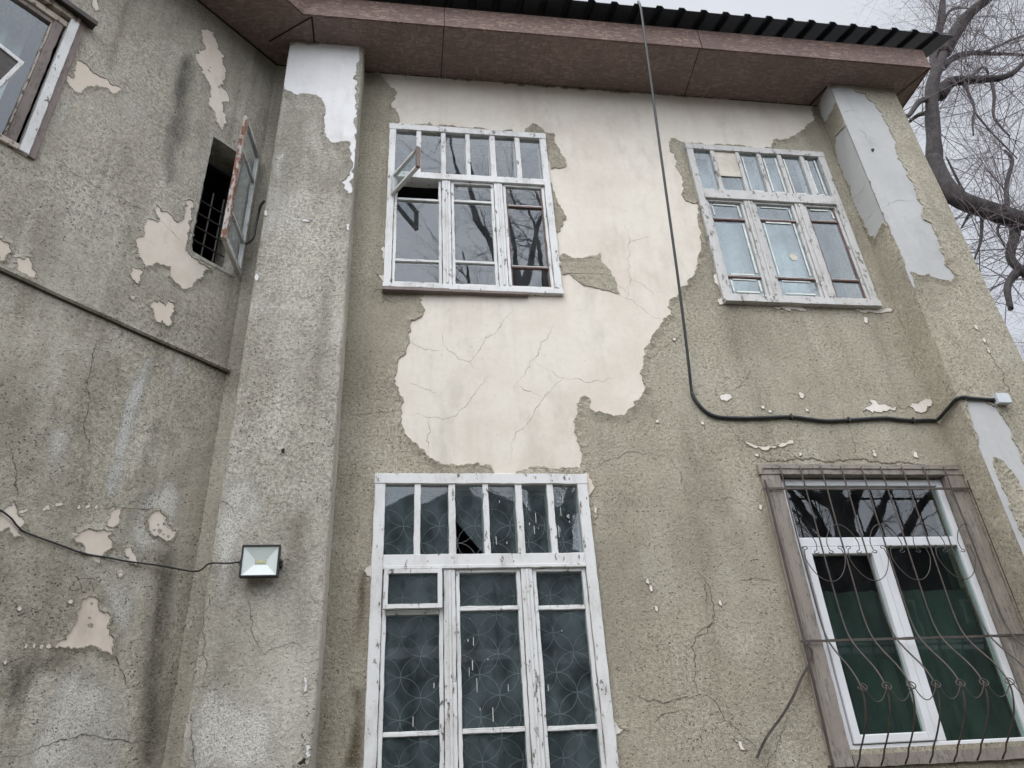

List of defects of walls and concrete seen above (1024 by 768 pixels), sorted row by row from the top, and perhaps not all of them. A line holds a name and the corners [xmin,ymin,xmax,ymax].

peeling [64,56,125,98]
peeling [192,26,233,133]
peeling [129,197,213,331]
peeling [283,41,962,525]
peeling [0,496,62,543]
peeling [69,505,139,582]
peeling [142,507,179,546]
peeling [25,591,119,660]
crack [637,574,787,767]
crack [2,734,158,757]